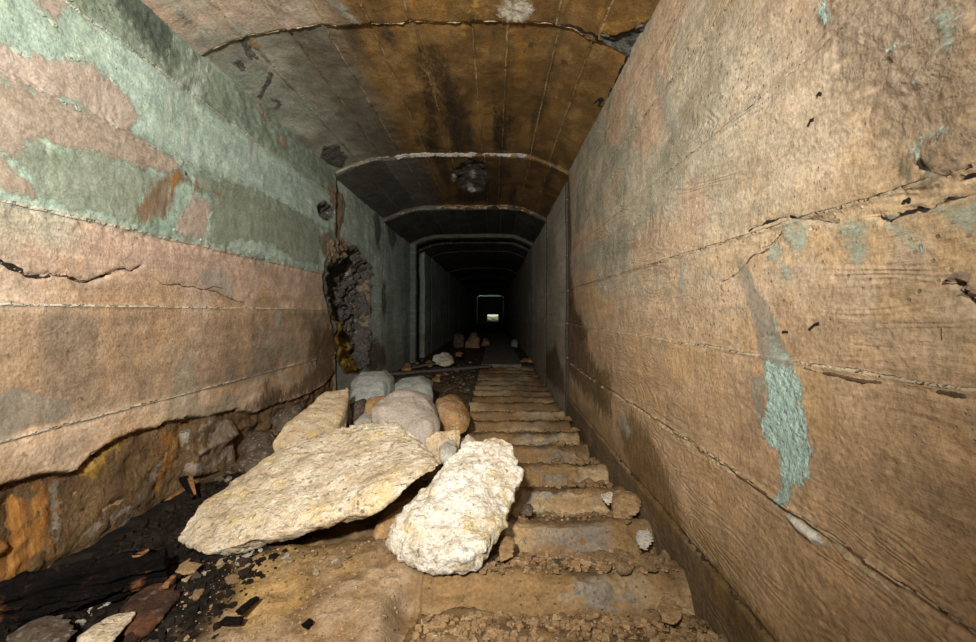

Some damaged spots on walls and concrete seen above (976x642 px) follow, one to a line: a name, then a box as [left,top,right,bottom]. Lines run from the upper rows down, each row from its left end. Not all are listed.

efflorescence [480,0,591,40]
spalling [600,16,651,57]
crack [593,56,628,107]
peeling [0,42,182,199]
corrosion [136,170,221,223]
crack [880,157,976,222]
crack [724,215,837,281]
crack [0,259,244,304]
spalling [322,237,373,373]
corrosion [79,444,124,479]
spalling [0,376,334,580]
corrosion [0,477,60,581]